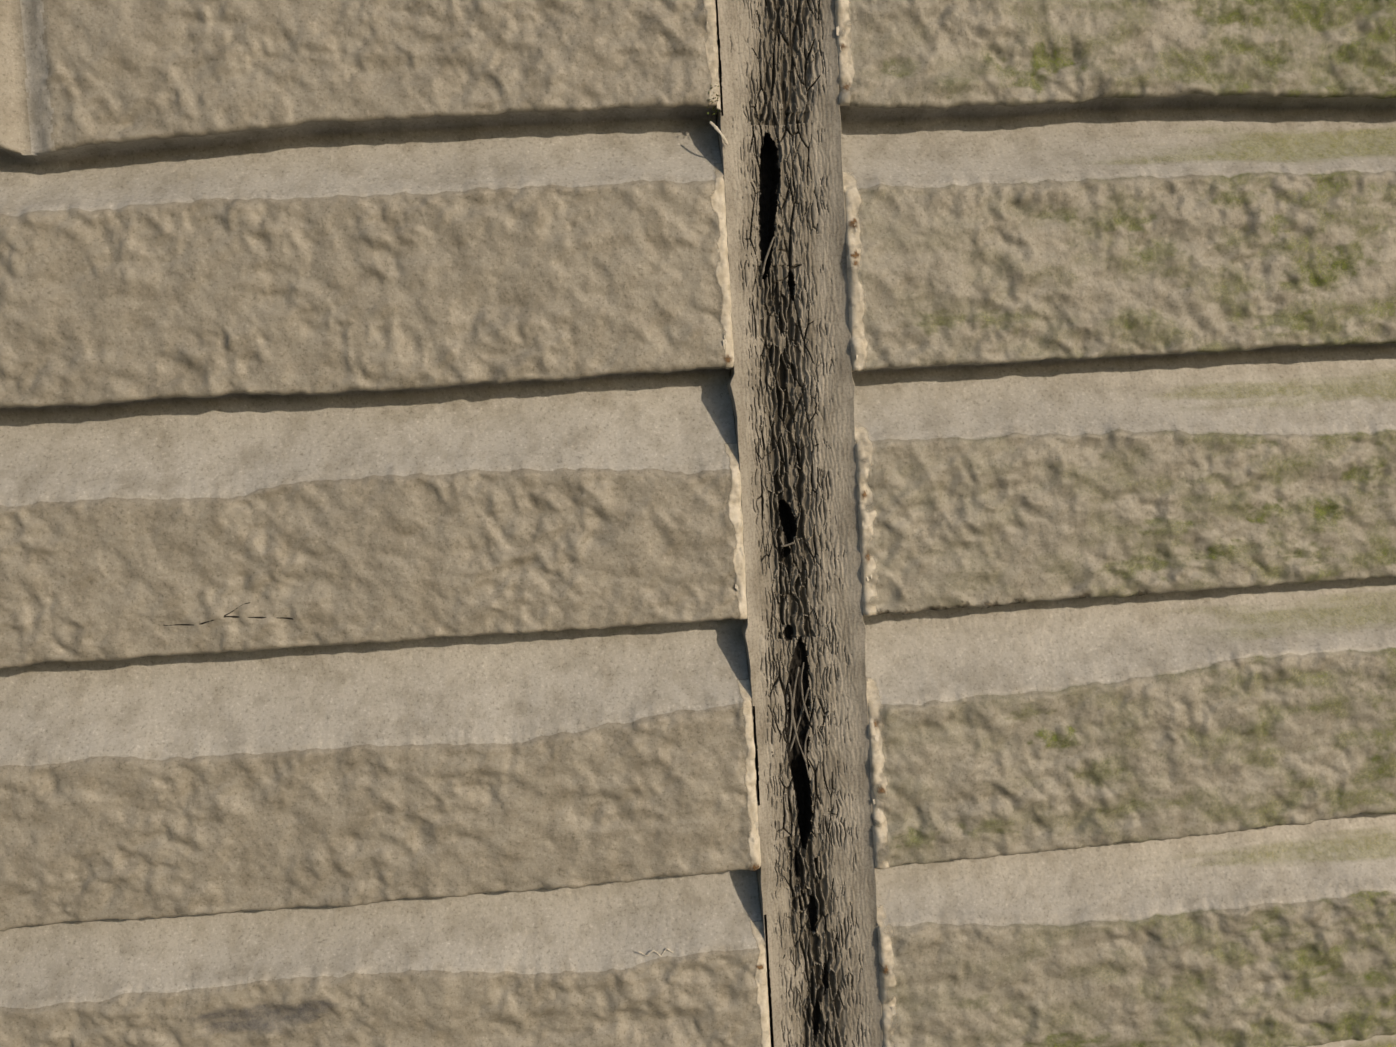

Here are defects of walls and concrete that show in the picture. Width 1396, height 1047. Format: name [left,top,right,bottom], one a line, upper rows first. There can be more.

crack [715,0,870,1047]